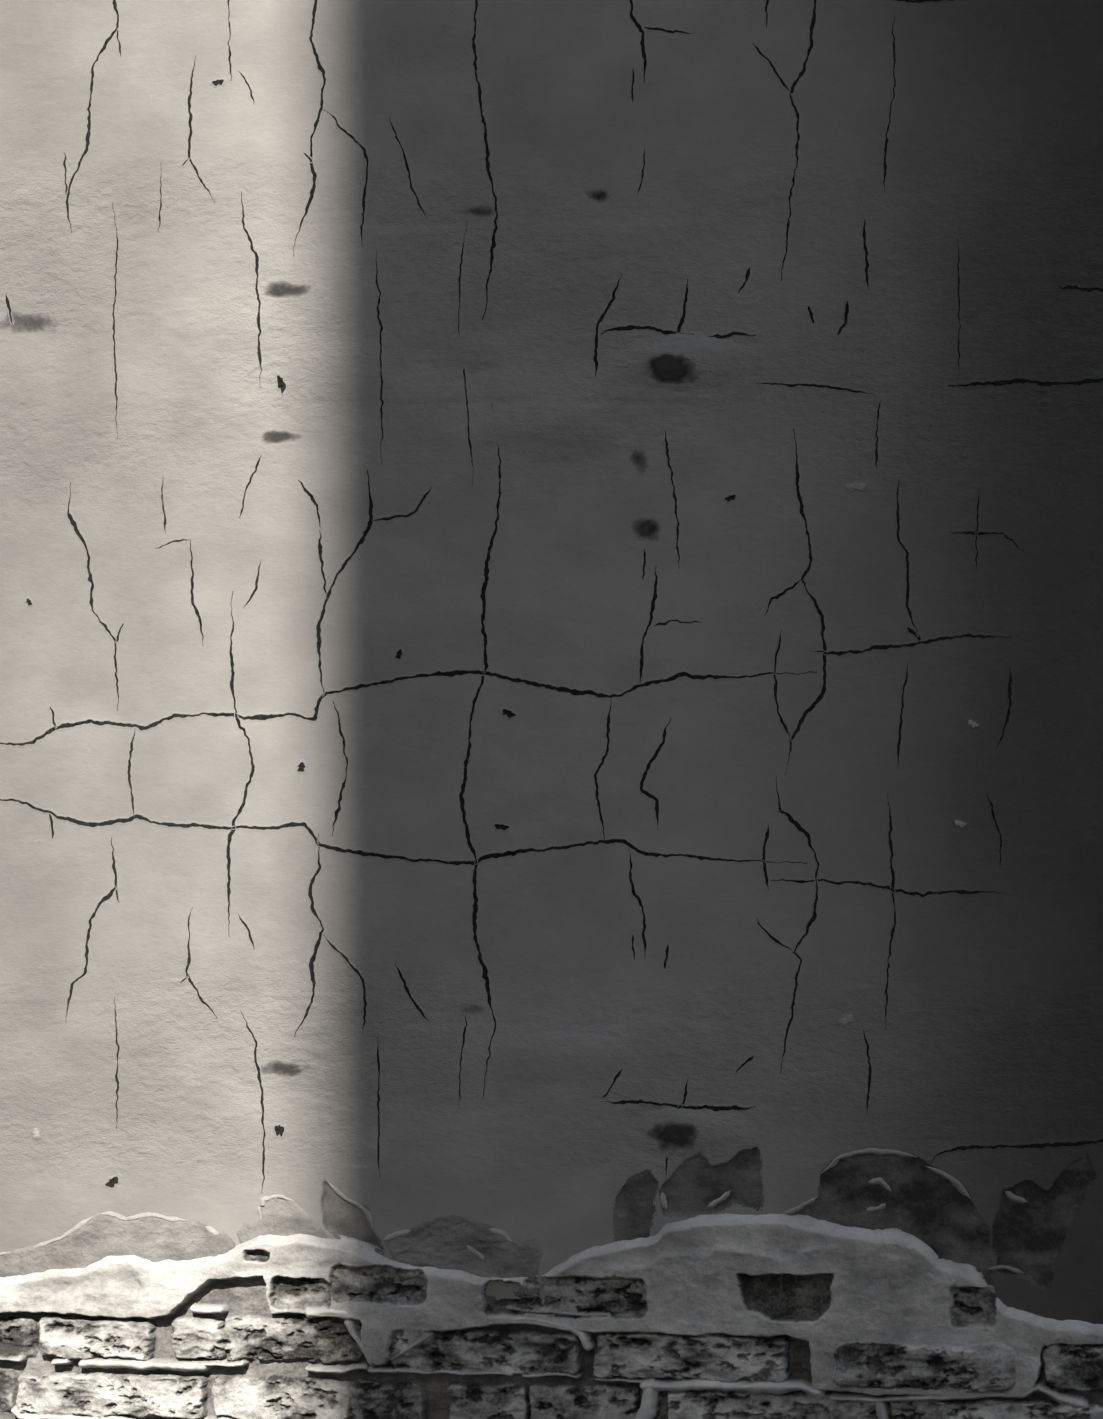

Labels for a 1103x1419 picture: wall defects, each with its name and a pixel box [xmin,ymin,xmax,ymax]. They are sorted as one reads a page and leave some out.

crack [0,0,1025,1193]
spalling [101,1173,122,1191]
peeling [0,1180,544,1283]
peeling [613,1147,765,1242]
peeling [784,1147,1098,1294]